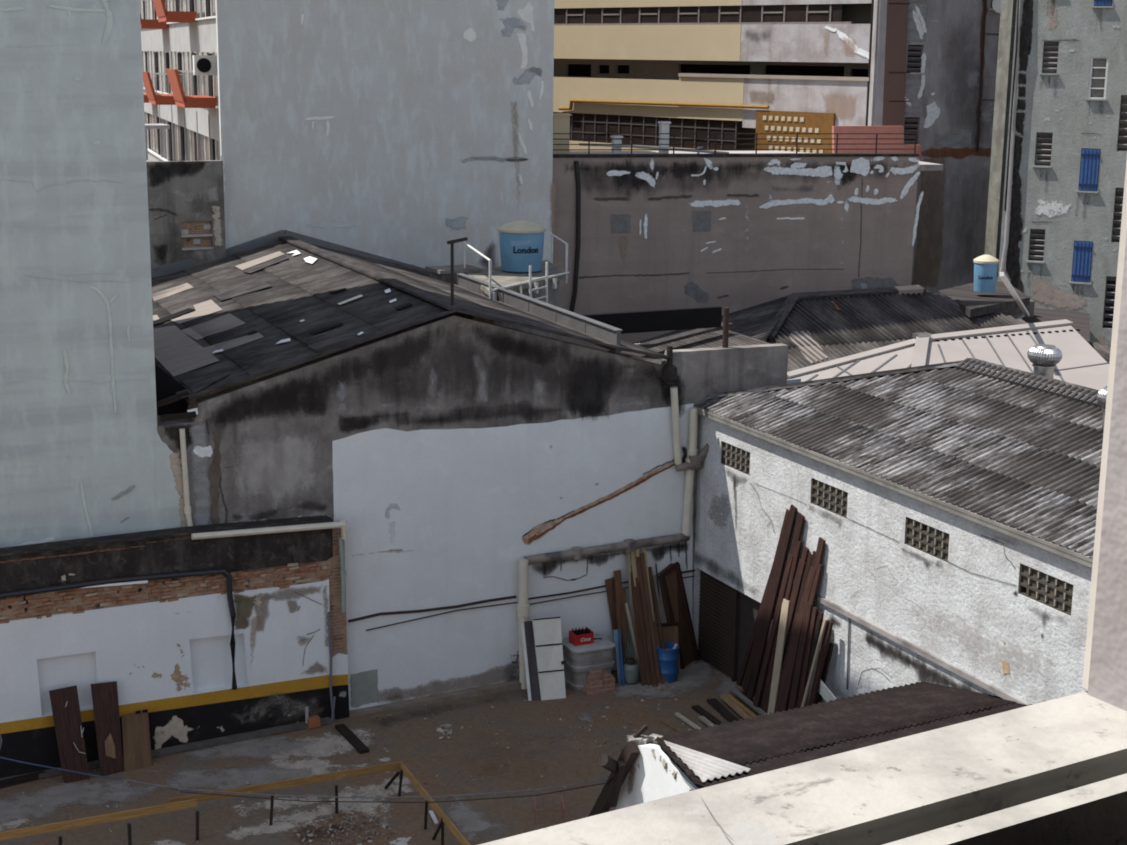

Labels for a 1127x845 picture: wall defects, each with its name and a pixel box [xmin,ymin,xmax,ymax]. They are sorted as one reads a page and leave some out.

peeling [1035,199,1074,218]
water stain [216,327,557,431]
water stain [567,358,649,416]
water stain [646,370,684,415]
crack [750,483,806,530]
crack [847,518,899,543]
crack [946,535,1016,586]
peeling [234,595,262,646]
water stain [865,633,986,695]
peeling [153,716,194,749]